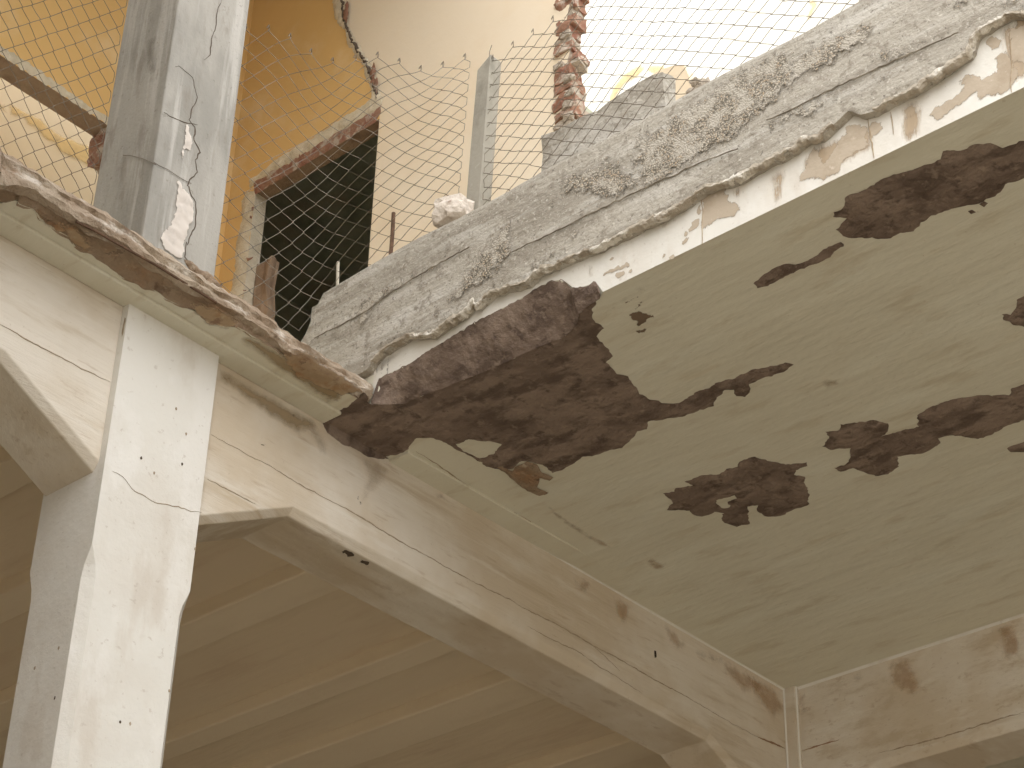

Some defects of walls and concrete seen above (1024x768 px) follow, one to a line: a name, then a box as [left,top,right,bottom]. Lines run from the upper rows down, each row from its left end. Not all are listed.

water stain [610,66,663,100]
peeling [930,25,1024,120]
crack [164,3,221,260]
peeling [799,121,883,181]
flaking render [0,0,793,496]
flaking render [754,141,1024,288]
crack [0,324,110,382]
flaking render [822,384,1024,476]
crack [112,471,198,512]
flaking render [663,457,810,527]
crack [214,436,838,750]